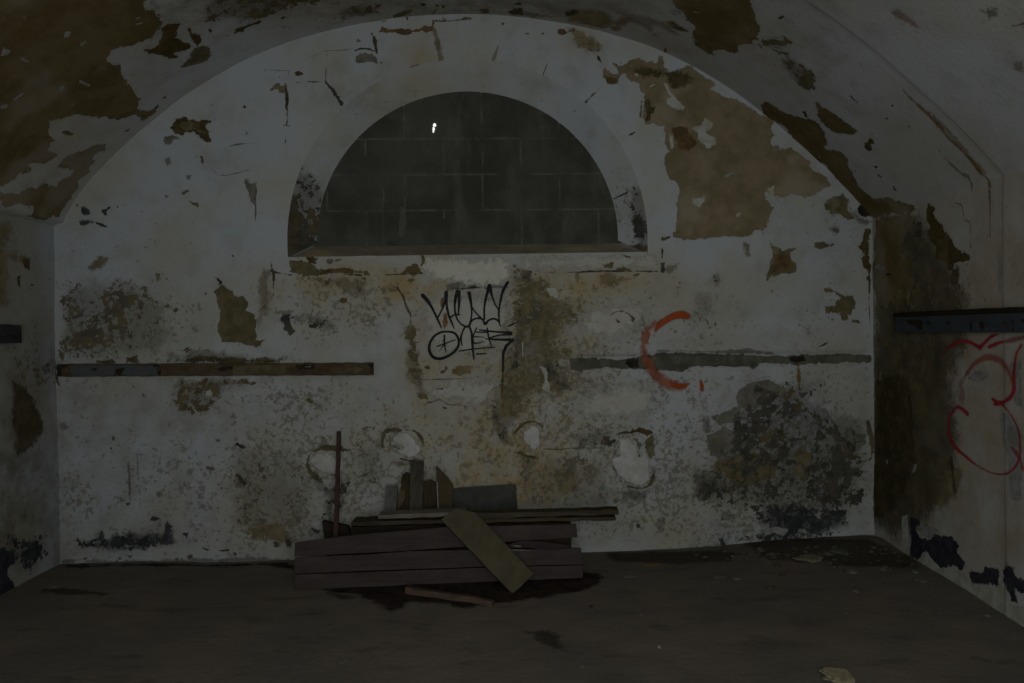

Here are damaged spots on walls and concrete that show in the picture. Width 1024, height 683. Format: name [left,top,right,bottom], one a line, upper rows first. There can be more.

peeling [0,0,213,220]
peeling [572,39,970,311]
water stain [567,187,665,287]
peeling [214,277,265,348]
water stain [447,264,582,442]
peeling [824,288,860,323]
water stain [608,216,1024,603]
water stain [520,429,616,508]
peeling [901,515,1024,627]